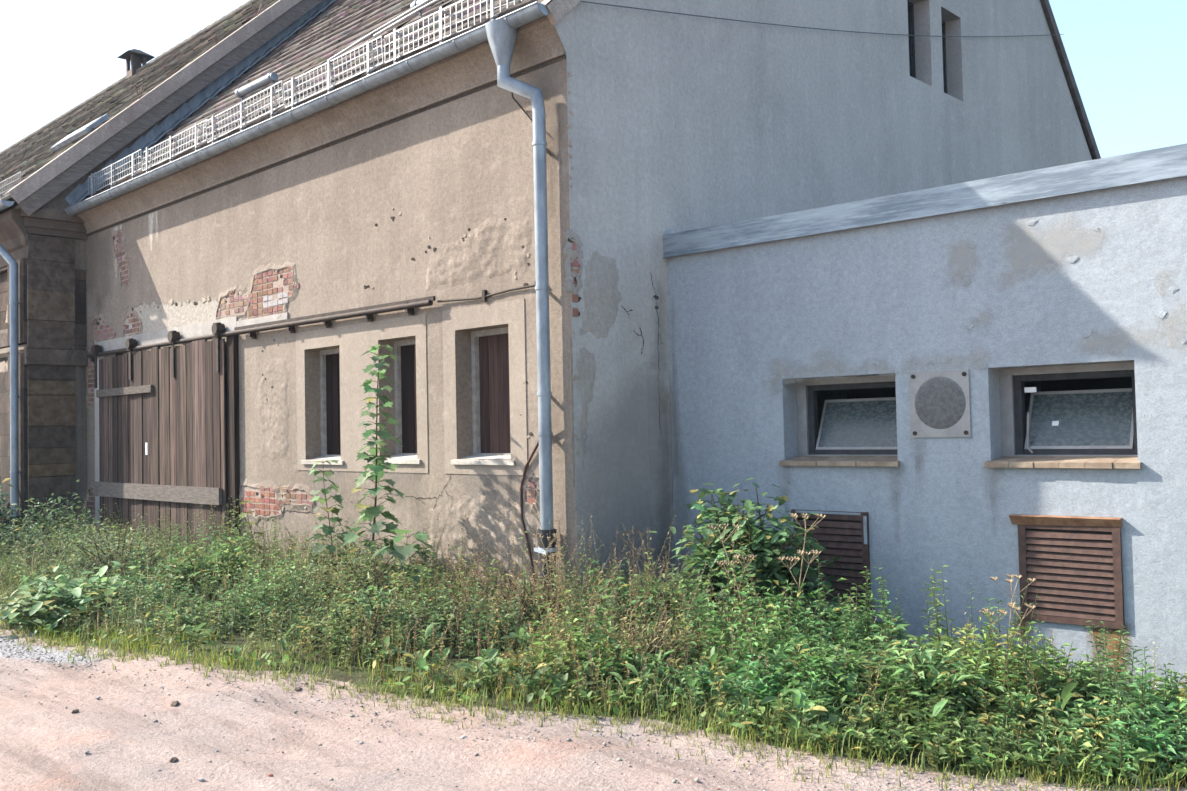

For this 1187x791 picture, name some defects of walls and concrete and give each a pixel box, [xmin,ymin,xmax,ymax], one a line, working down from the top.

flaking render [563,229,584,317]
flaking render [86,261,299,410]
flaking render [239,478,319,524]
corrosion [1093,625,1127,682]